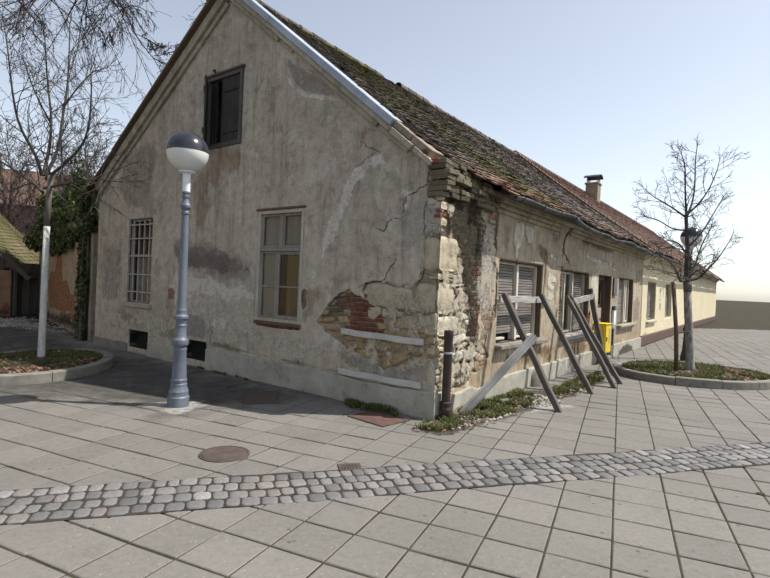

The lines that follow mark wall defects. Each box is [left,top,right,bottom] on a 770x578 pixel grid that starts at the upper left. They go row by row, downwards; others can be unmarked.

crack [379,174,429,232]
peeling [513,223,534,259]
flaking render [48,254,76,323]
spalling [318,166,499,392]
peeling [547,268,563,323]